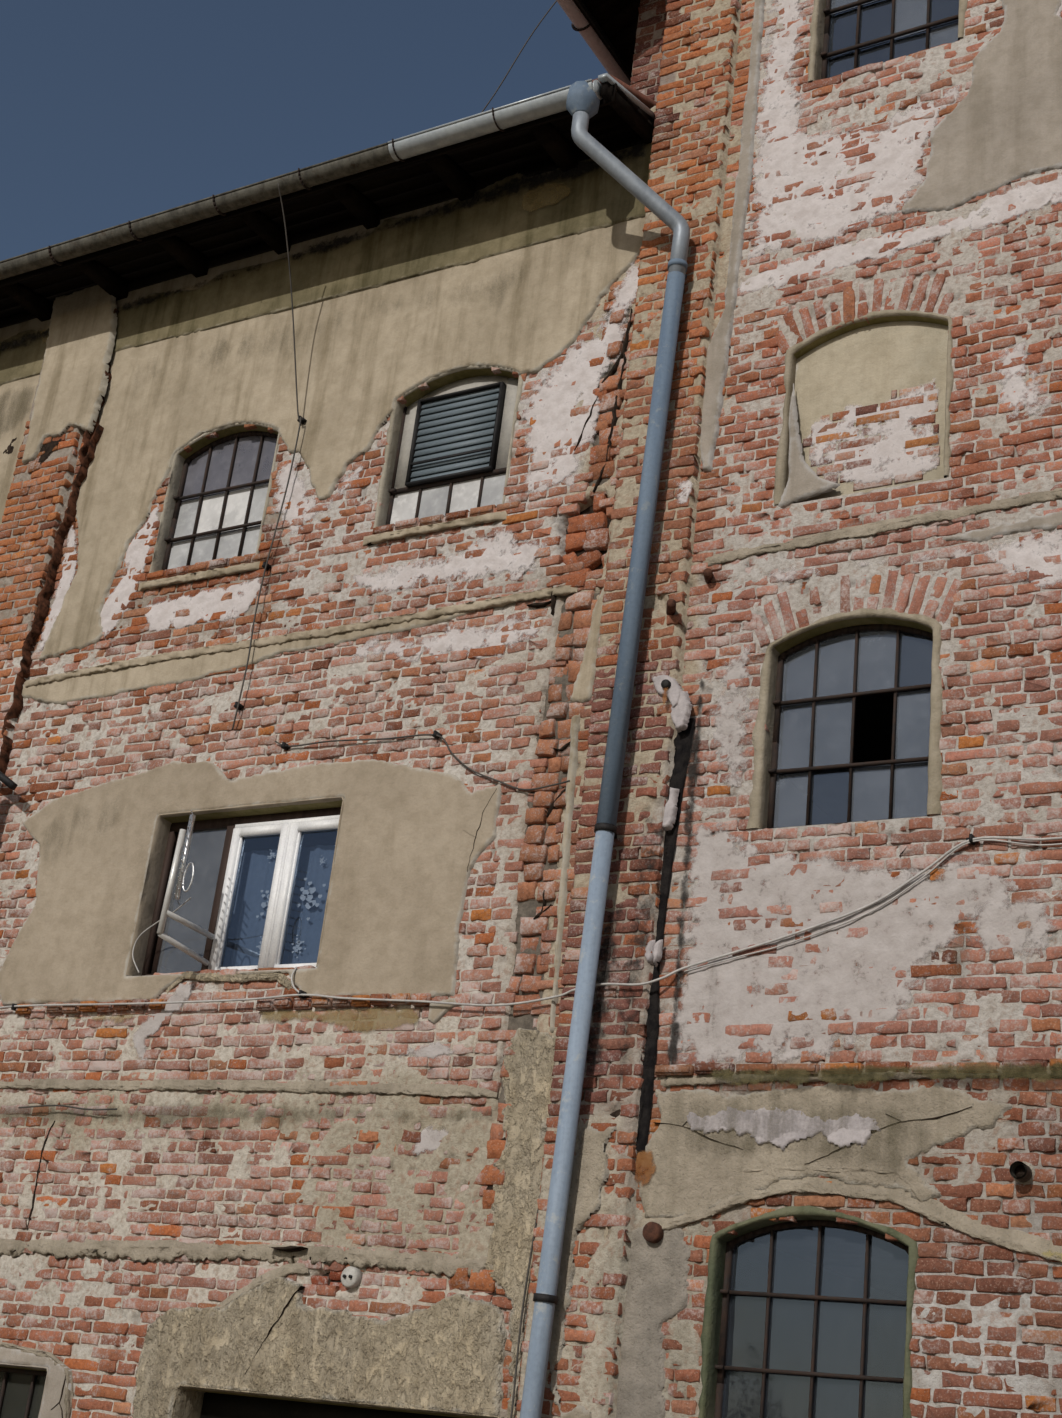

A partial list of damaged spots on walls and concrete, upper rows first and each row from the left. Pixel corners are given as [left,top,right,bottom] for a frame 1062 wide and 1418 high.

peeling [116,198,458,307]
peeling [700,0,765,472]
crack [574,308,633,493]
spalling [778,380,940,508]
crack [0,363,112,774]
peeling [0,217,645,1418]
peeling [645,939,663,967]
crack [653,1121,741,1149]
crack [806,1107,970,1164]
crack [267,1245,308,1253]
peeling [616,1082,1013,1418]
crack [245,1286,305,1374]